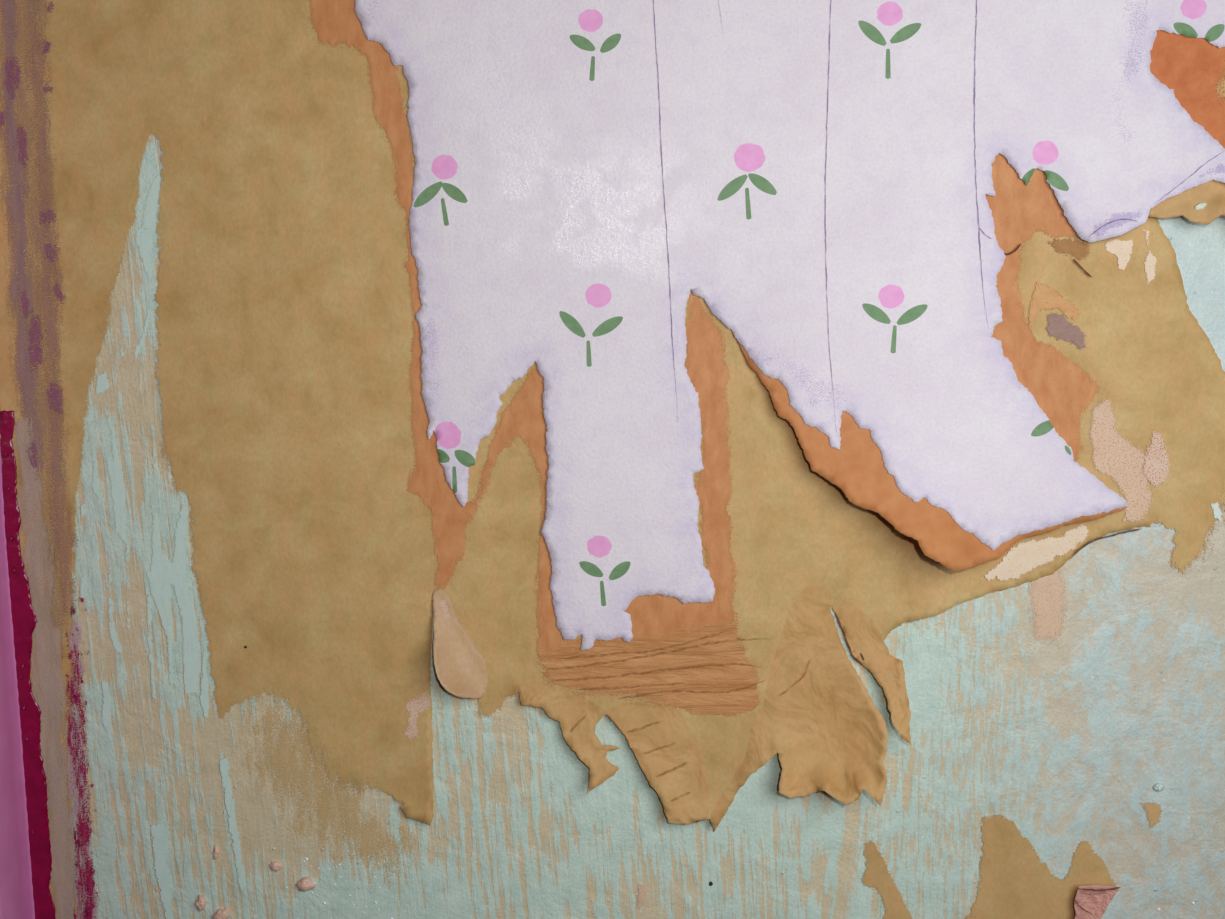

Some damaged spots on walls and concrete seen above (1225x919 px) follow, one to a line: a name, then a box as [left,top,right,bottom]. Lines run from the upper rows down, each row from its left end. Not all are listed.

peeling [1105,180,1225,284]
flaking render [1211,502,1222,521]
flaking render [981,525,1089,582]